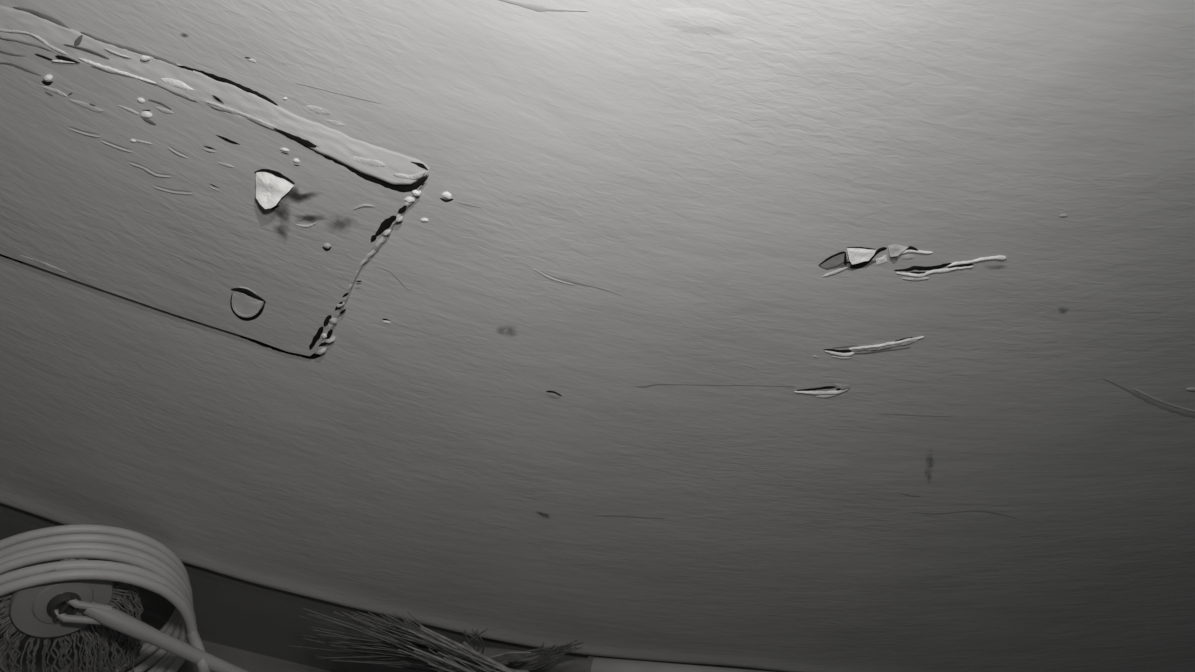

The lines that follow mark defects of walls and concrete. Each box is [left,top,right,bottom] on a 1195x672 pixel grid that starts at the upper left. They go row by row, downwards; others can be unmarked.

crack [499,0,587,12]
flaking render [254,169,312,233]
spalling [309,189,421,355]
peeling [818,244,933,277]
crack [1100,377,1195,418]